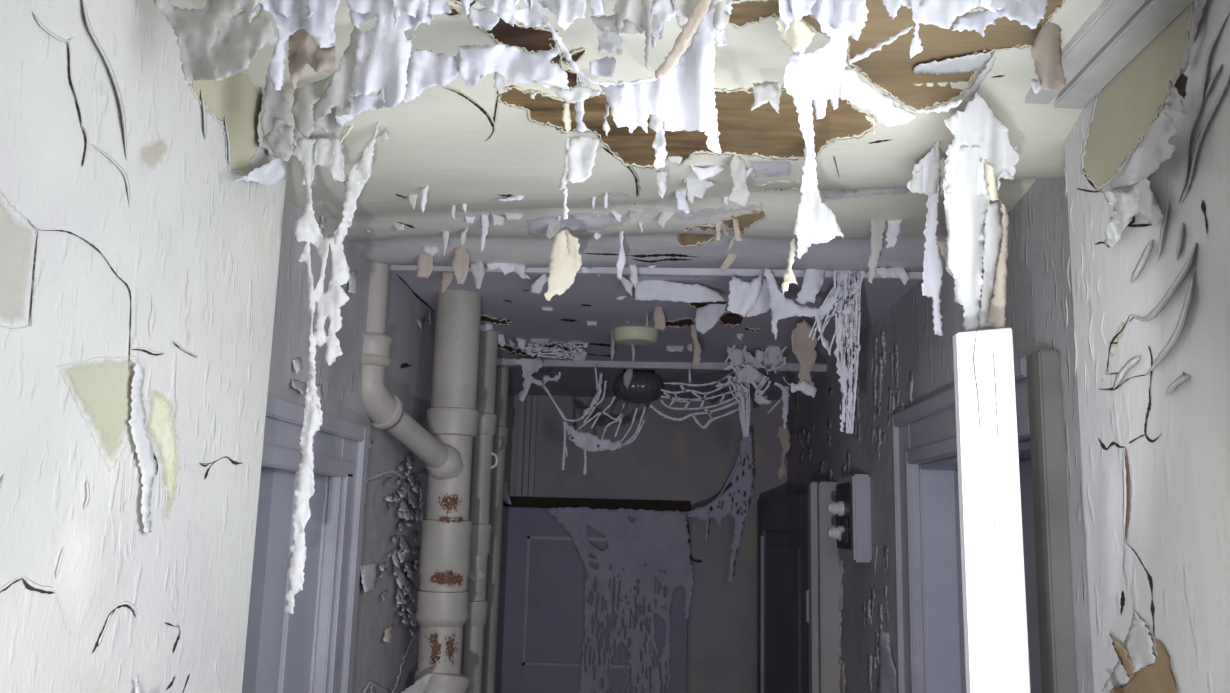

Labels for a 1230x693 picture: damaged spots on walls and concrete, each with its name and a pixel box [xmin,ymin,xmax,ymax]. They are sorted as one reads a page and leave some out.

crack [67,39,88,166]
peeling [1076,0,1207,248]
crack [1200,200,1208,234]
crack [29,221,198,361]
peeling [153,0,1066,614]
crack [0,575,56,594]
peeling [57,355,177,535]
peeling [352,453,428,693]
rust [427,633,458,669]
rust [431,570,464,587]
rust [437,493,465,523]
crack [1098,316,1162,634]